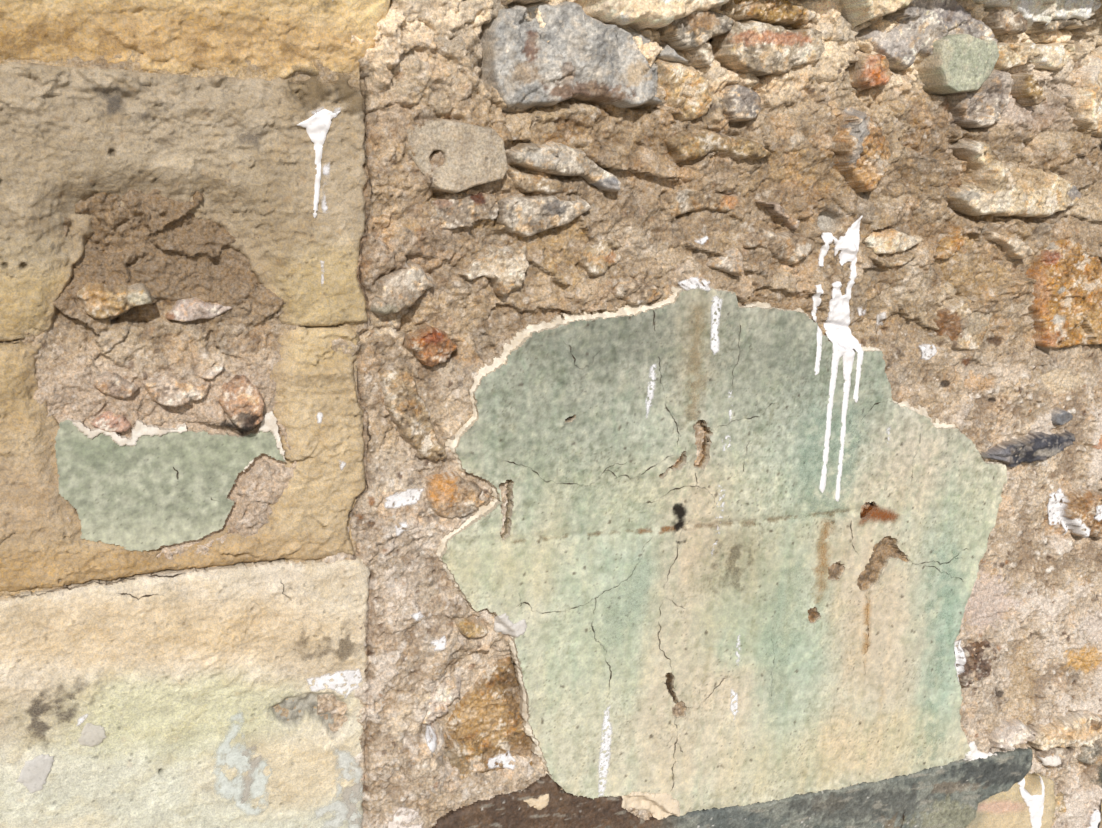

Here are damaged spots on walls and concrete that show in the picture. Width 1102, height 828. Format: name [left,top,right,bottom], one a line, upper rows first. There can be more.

spalling [659,420,710,477]
spalling [495,479,512,538]
spalling [828,561,844,580]
spalling [857,536,908,591]
flaking render [494,613,527,637]
spalling [808,607,819,622]
spalling [665,673,686,717]
flaking render [963,741,997,761]
flaking render [523,794,549,810]
flaking render [621,791,680,820]